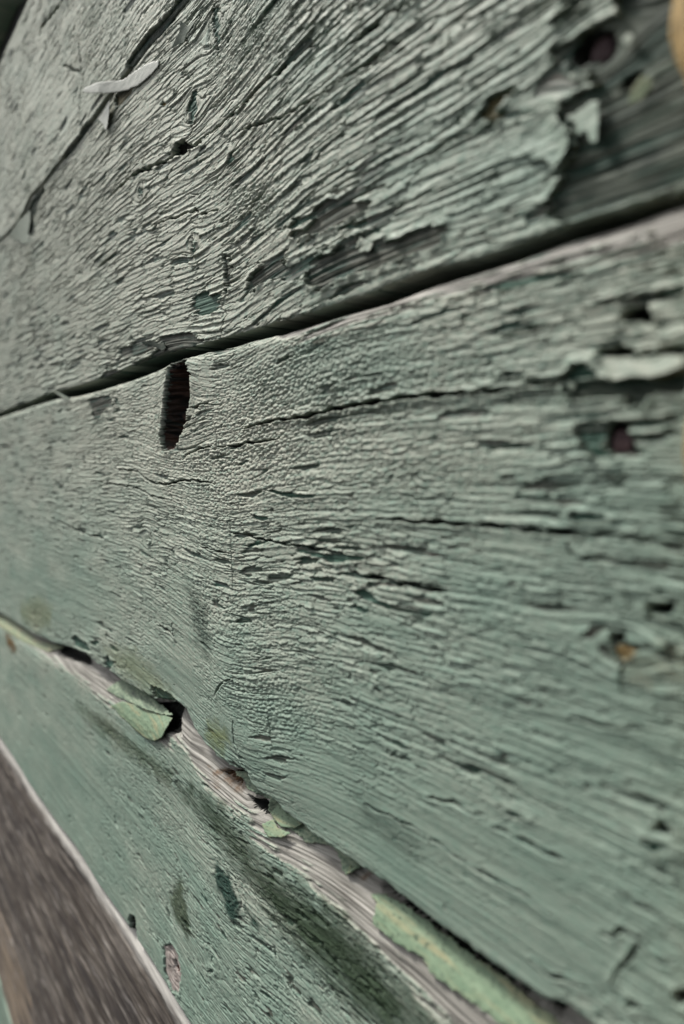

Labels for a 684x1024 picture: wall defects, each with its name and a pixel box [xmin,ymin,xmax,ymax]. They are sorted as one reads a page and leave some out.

peeling [546,0,684,222]
crack [123,142,196,186]
peeling [290,198,447,291]
peeling [565,355,684,407]
crack [187,378,571,455]
crack [633,431,684,440]
crack [92,469,212,498]
crack [205,533,446,592]
crack [381,518,683,561]
peeling [107,680,177,741]
peeling [235,770,361,875]
peeling [371,893,561,1024]